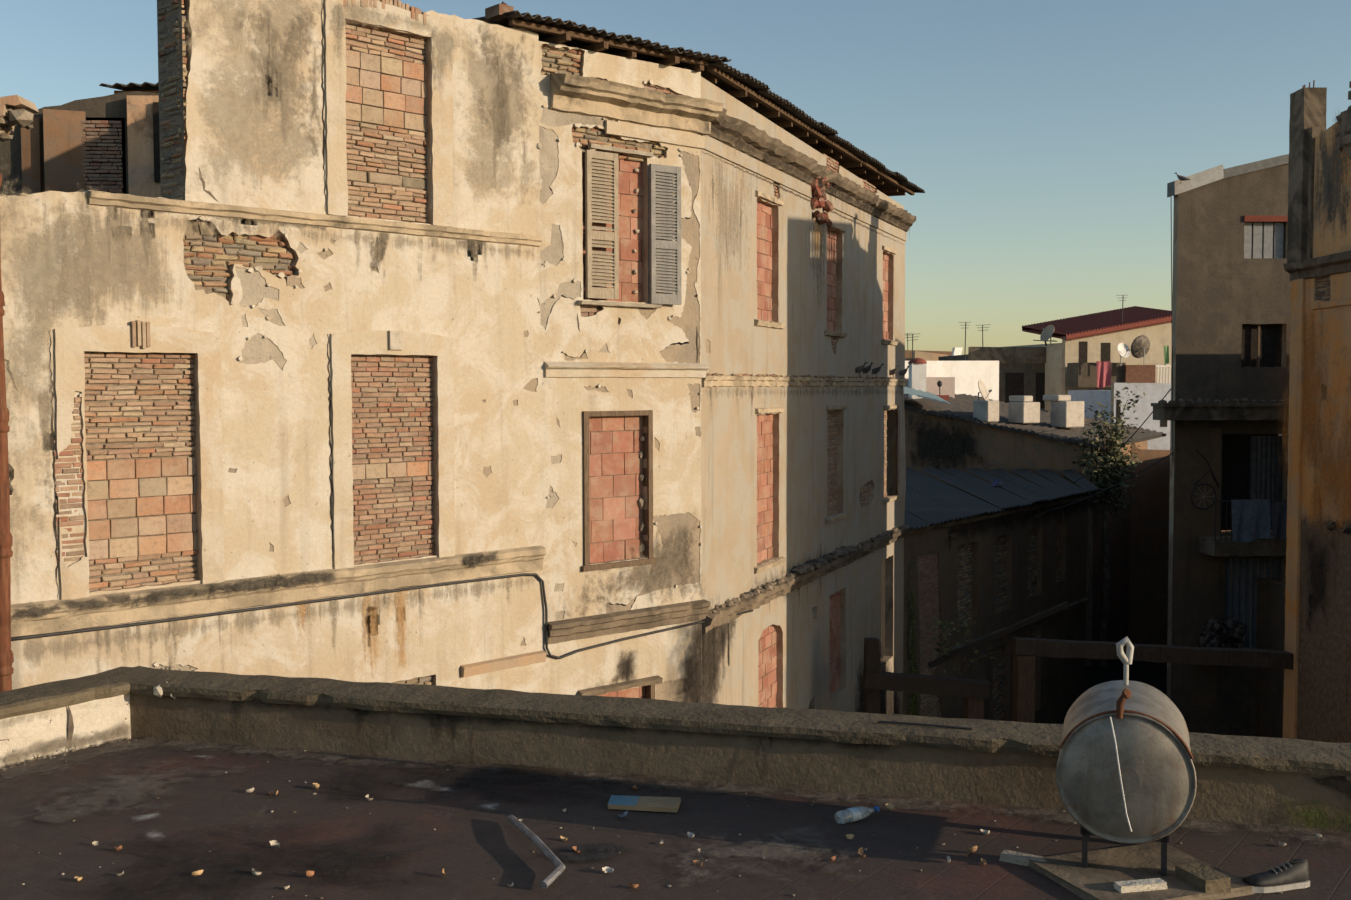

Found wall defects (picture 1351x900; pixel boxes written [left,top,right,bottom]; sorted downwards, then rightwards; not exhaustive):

spalling [0,106,34,142]
flaking render [183,216,335,369]
peeling [523,278,607,337]
peeling [537,105,710,363]
flaking render [54,394,88,572]
peeling [687,383,702,437]
damp [1297,517,1351,743]